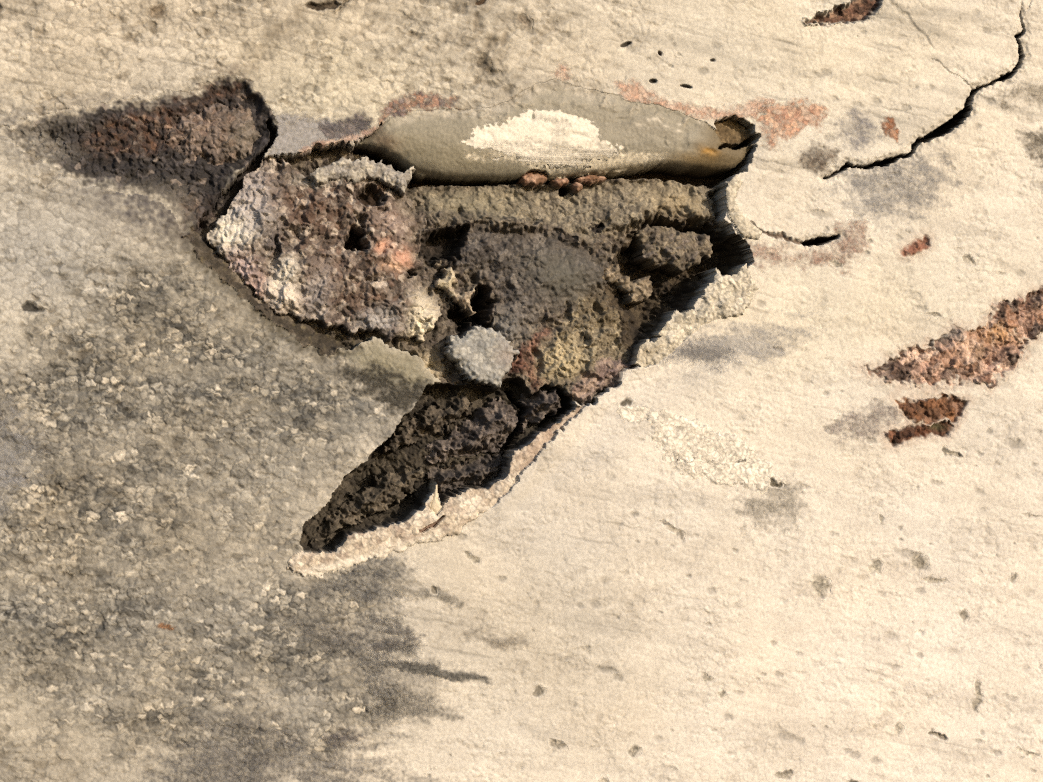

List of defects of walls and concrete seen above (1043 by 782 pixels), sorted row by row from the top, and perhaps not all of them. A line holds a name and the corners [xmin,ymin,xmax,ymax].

efflorescence [461,109,663,179]
hole [800,0,885,28]
crack [823,0,1033,180]
crack [750,221,840,247]
spalling [0,73,786,579]
corrosion [853,286,1043,448]